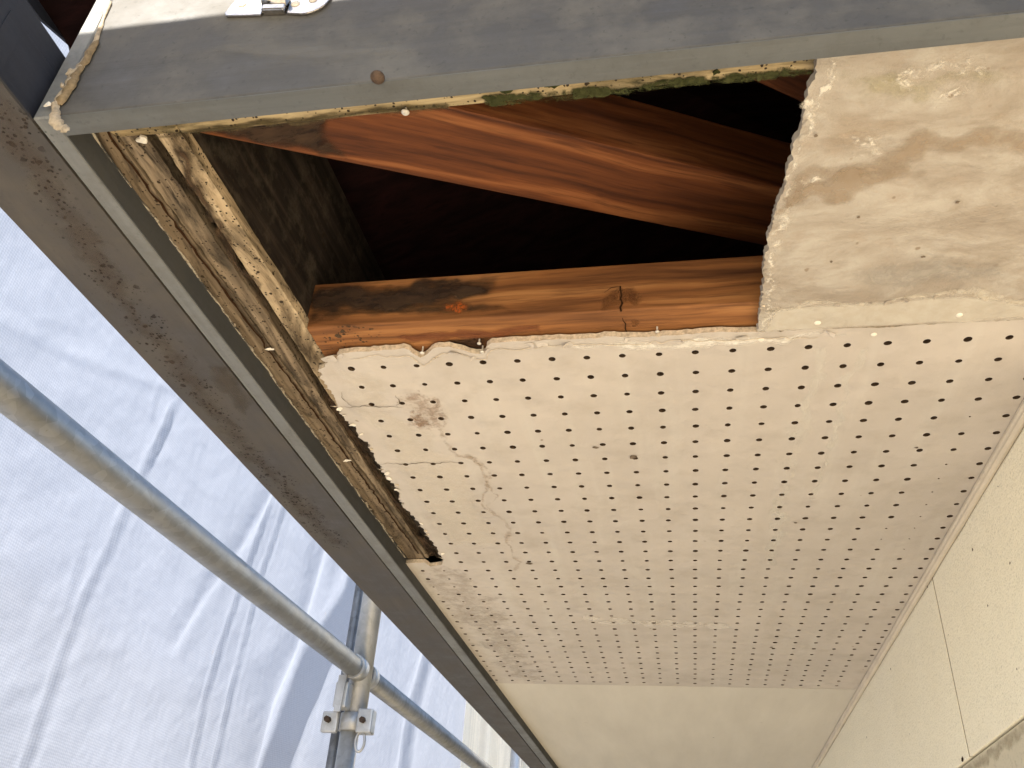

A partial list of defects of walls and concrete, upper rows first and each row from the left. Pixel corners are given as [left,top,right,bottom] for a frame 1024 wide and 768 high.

water stain [0,104,347,548]
crack [107,132,464,554]
water stain [311,279,492,318]
crack [605,286,627,332]
peeling [359,63,1024,366]
water stain [778,132,1024,212]
water stain [323,387,434,556]